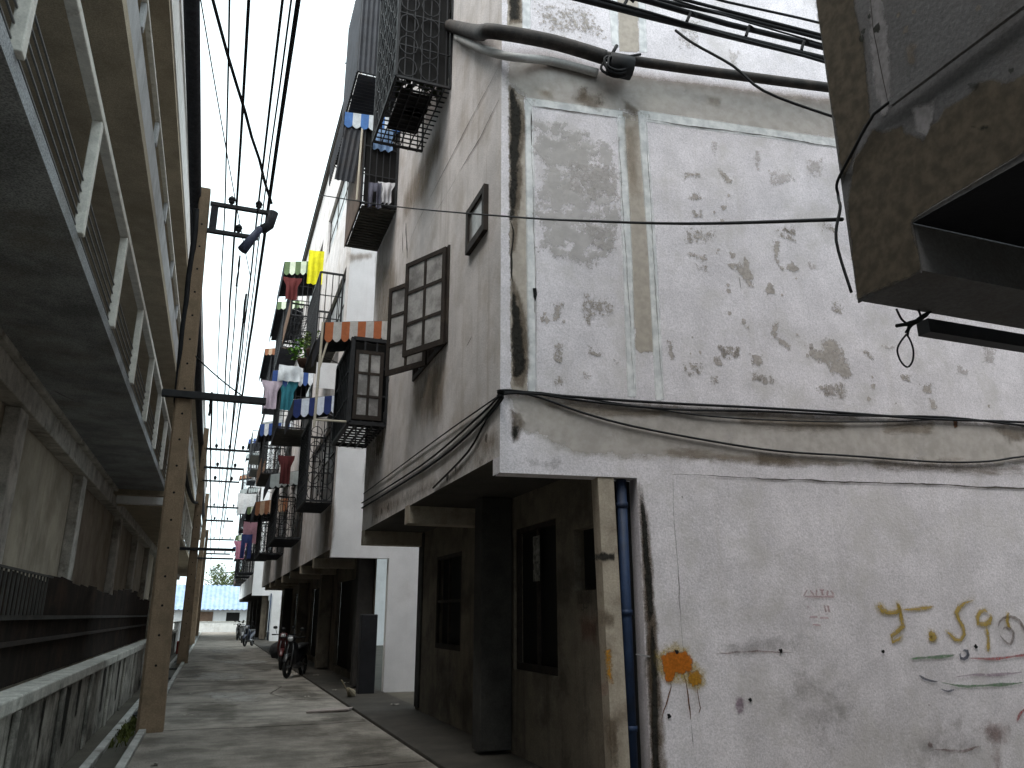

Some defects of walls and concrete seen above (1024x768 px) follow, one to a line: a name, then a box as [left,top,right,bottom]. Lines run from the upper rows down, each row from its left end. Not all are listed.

peeling [507,0,606,39]
leakage [509,89,529,386]
peeling [508,85,621,391]
peeling [684,170,783,296]
peeling [773,226,816,279]
peeling [667,340,774,384]
peeling [771,323,852,399]
leakage [512,413,522,438]
leakage [641,503,666,768]